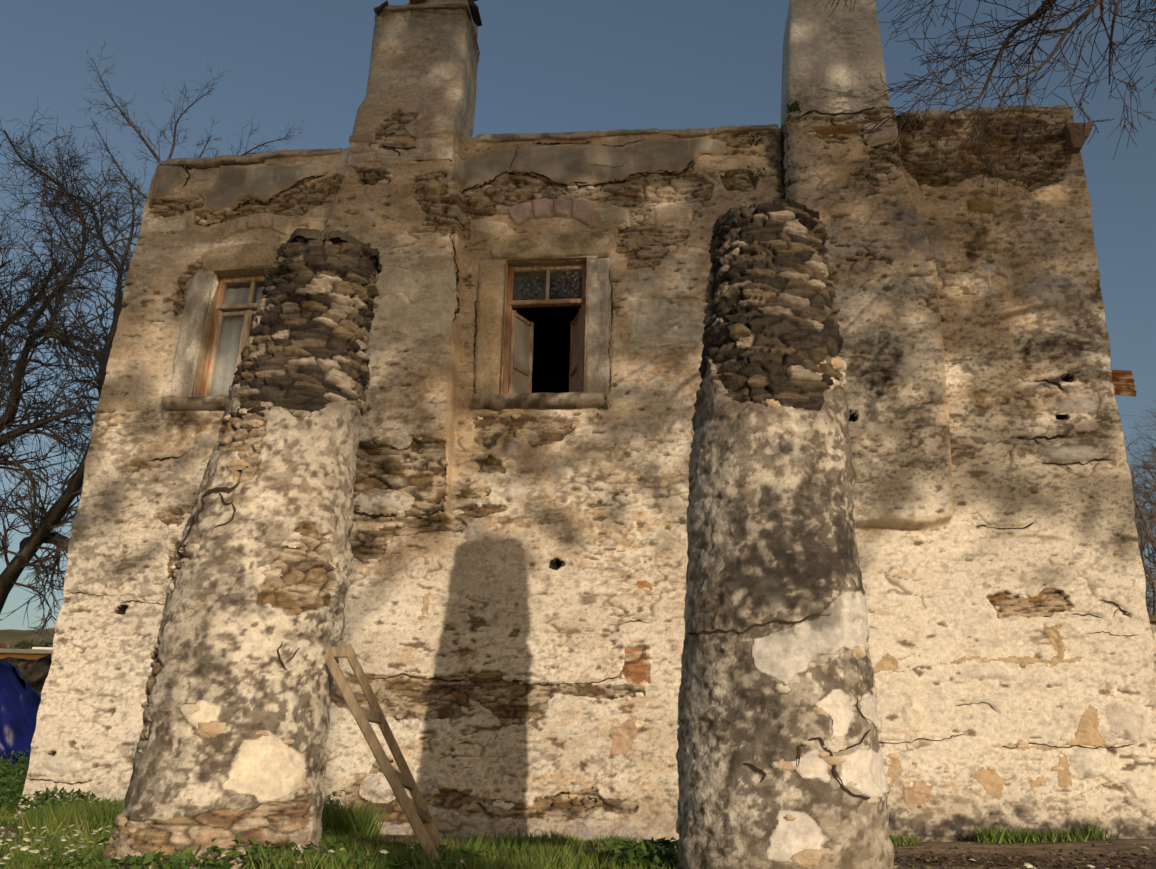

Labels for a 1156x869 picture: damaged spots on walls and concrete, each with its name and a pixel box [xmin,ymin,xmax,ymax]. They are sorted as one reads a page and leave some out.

crack [455,139,694,195]
spalling [787,106,1072,191]
spalling [412,168,760,270]
spalling [694,202,847,413]
spalling [218,235,465,482]
spalling [464,414,578,474]
spalling [350,435,507,563]
spalling [153,505,201,594]
spalling [256,521,336,615]
crack [687,612,831,635]
spalling [940,588,1082,667]
spalling [330,644,653,727]